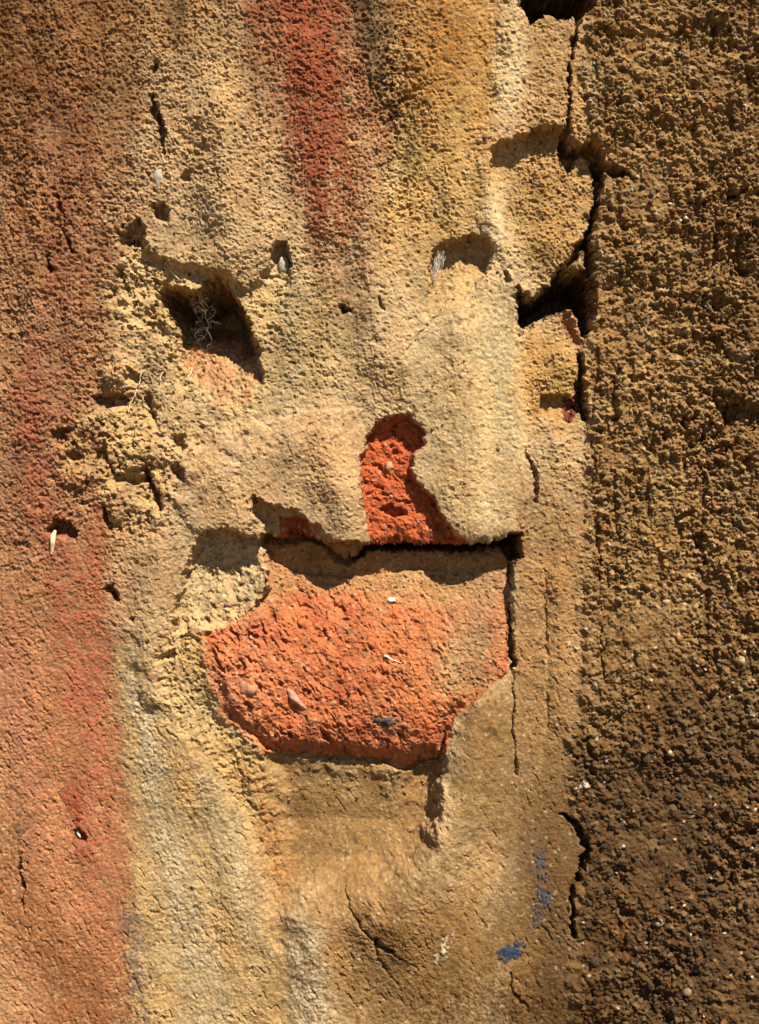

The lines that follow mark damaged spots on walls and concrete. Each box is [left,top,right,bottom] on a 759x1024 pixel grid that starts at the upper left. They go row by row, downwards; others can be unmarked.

crack [557,15,632,302]
spalling [155,274,267,411]
crack [571,353,598,489]
spalling [170,411,525,660]
spalling [374,717,397,728]
crack [506,558,520,778]
crack [558,812,594,942]